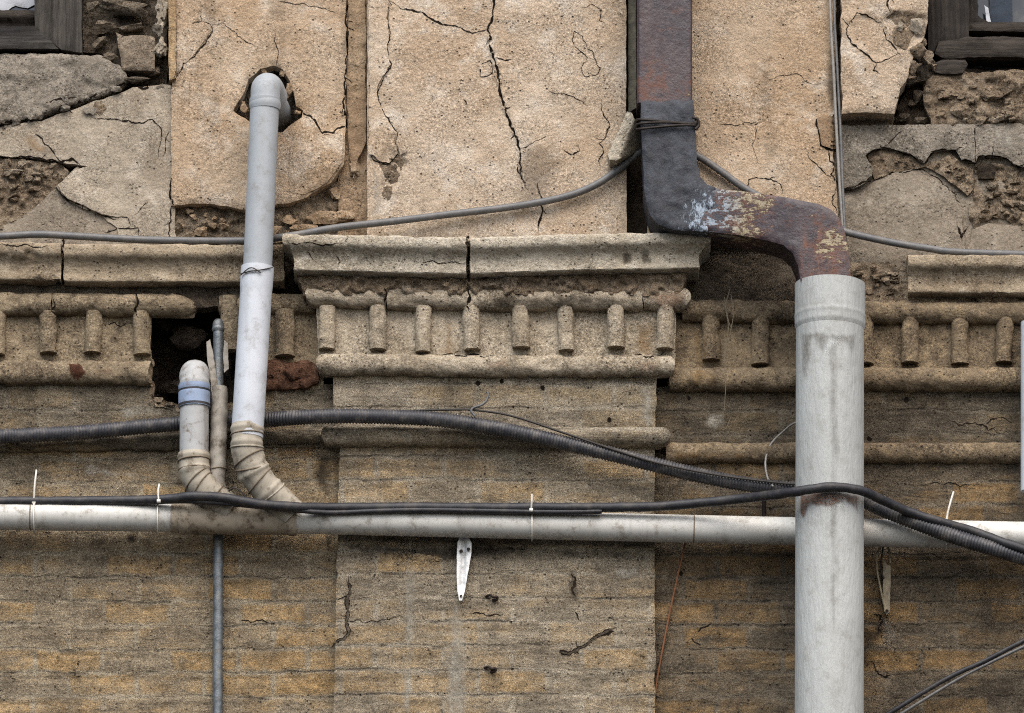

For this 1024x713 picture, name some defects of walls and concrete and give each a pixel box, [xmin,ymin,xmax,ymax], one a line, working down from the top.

crack [282,1,355,135]
spalling [885,11,1024,126]
crack [0,15,279,236]
crack [371,0,610,231]
spalling [0,158,125,230]
spalling [175,206,245,245]
spalling [273,162,359,245]
spalling [868,149,1024,230]
crack [422,236,471,312]
spalling [149,359,180,412]
crack [331,577,403,648]
crack [559,574,616,655]